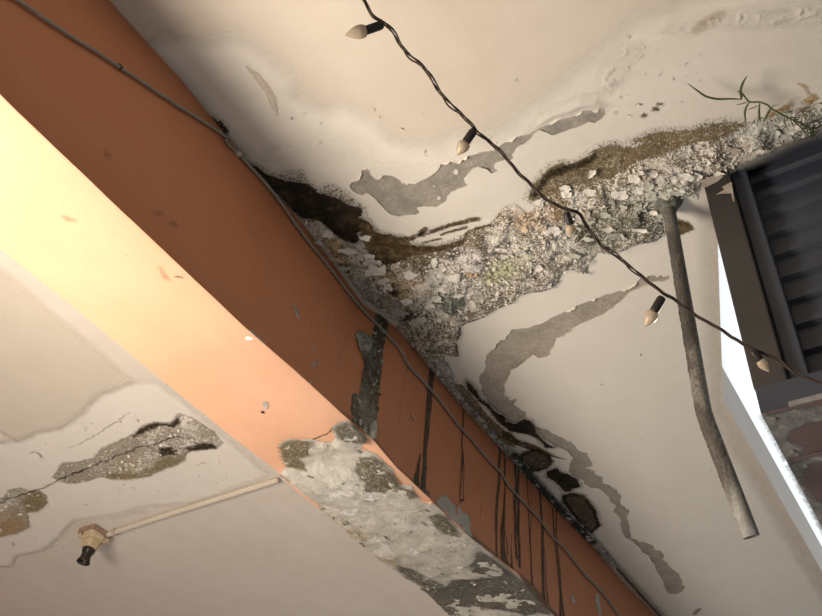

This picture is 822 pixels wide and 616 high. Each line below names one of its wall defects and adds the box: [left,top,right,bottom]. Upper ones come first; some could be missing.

damp [151,0,822,267]
flaking render [0,488,47,537]
crack [1,436,180,504]
flaking render [53,413,223,484]
flaking render [278,102,822,616]
damp [397,182,822,616]